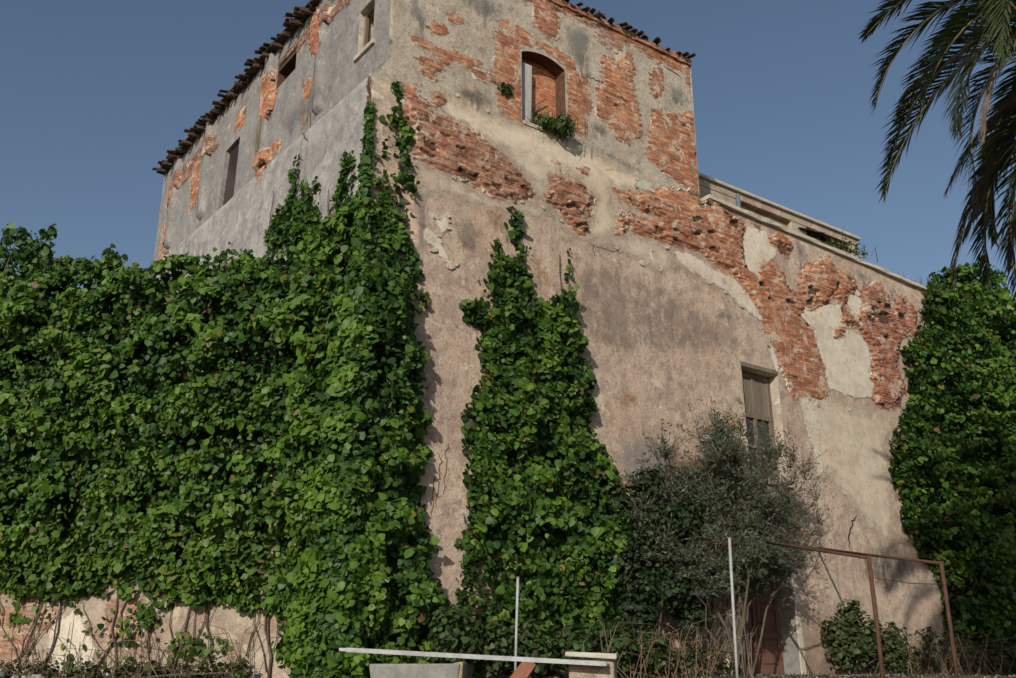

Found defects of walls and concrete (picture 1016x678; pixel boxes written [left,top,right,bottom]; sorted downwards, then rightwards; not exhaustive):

flaking render [307,5,322,58]
flaking render [234,104,246,132]
flaking render [258,68,277,123]
flaking render [252,138,283,180]
flaking render [188,161,200,213]
spalling [399,0,919,541]
crack [430,444,449,516]